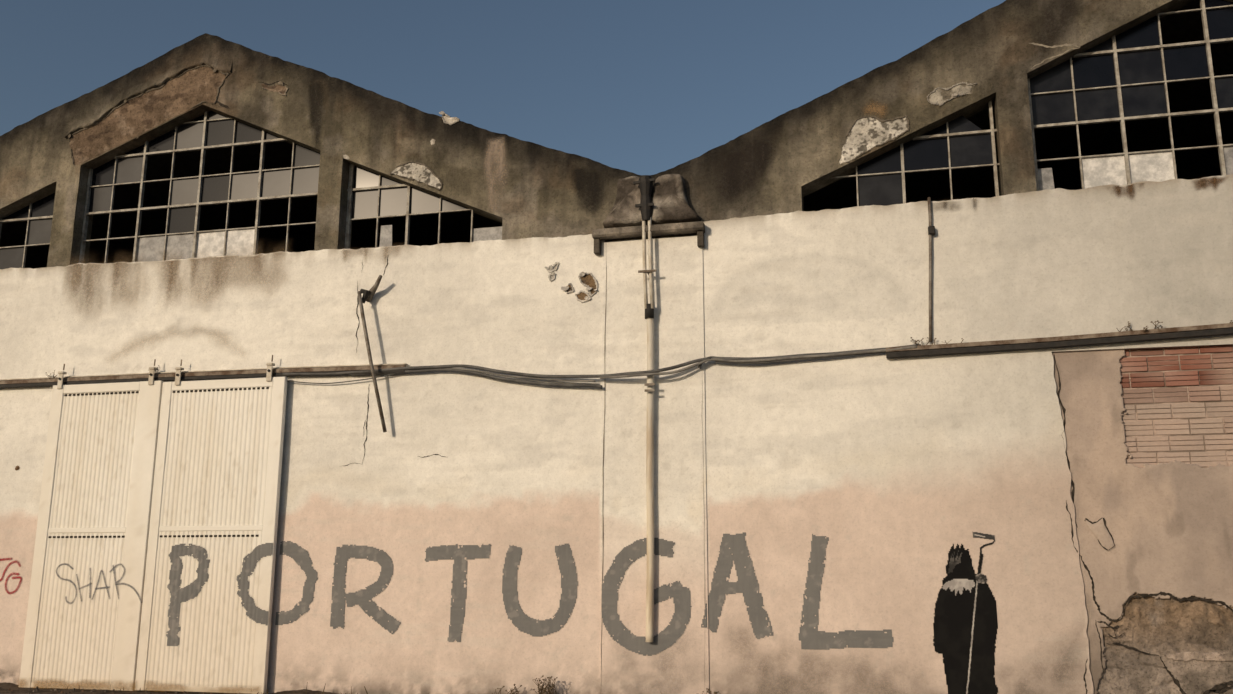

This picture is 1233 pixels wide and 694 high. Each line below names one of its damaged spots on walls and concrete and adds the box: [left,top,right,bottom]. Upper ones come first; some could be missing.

crack [65,53,232,159]
spalling [389,161,443,190]
spalling [439,111,460,126]
spalling [838,115,910,164]
spalling [927,82,977,106]
crack [355,255,389,351]
peeling [544,262,598,303]
crack [345,384,370,466]
flaking render [1119,345,1233,468]
crack [1054,355,1233,694]
spalling [1097,592,1233,694]